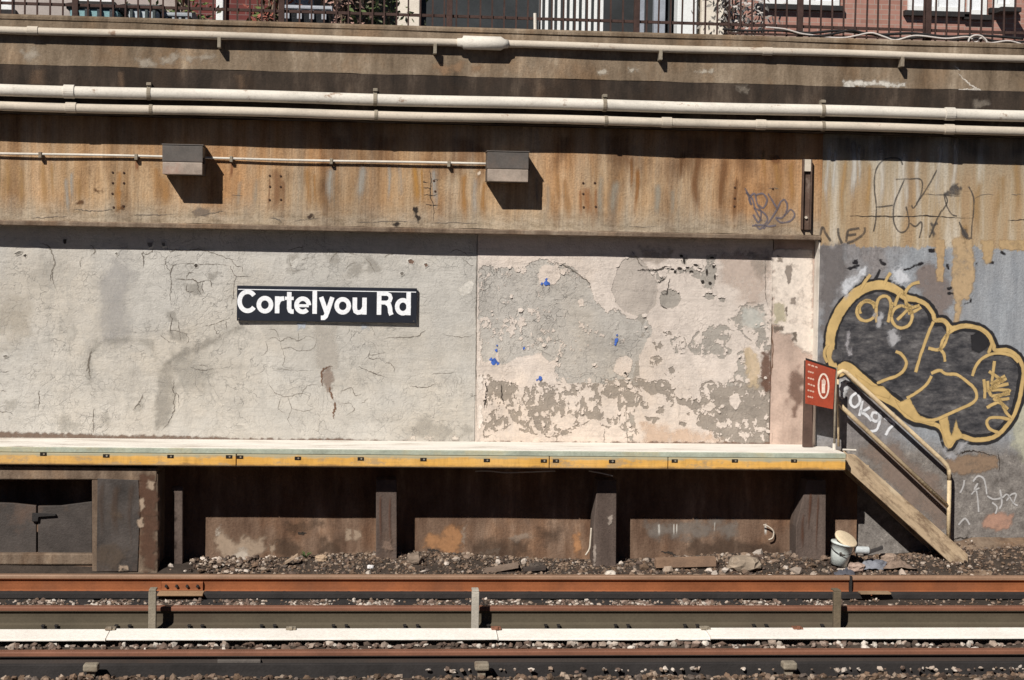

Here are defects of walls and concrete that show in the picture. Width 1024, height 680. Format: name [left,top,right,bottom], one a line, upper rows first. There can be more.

corrosion [680,155,700,203]
corrosion [719,160,737,211]
crack [40,243,96,290]
crack [265,171,504,425]
crack [142,246,244,431]
peeling [458,245,859,444]
corrosion [425,525,463,553]